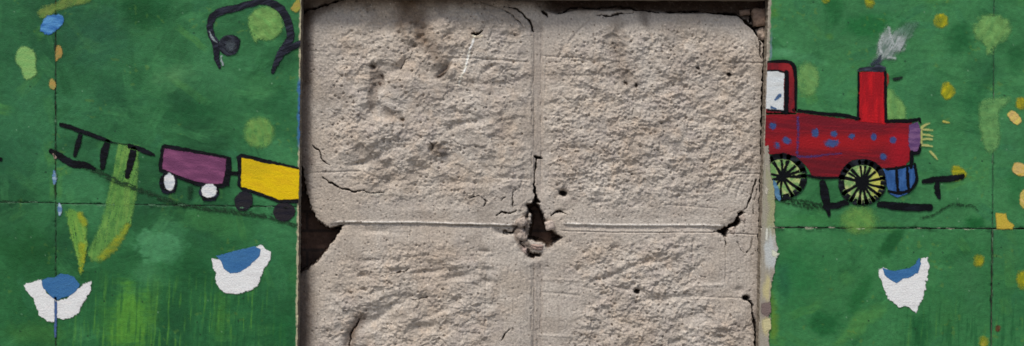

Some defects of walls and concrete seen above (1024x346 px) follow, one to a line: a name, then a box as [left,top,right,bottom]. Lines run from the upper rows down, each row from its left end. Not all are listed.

crack [507,6,764,253]
crack [313,146,383,193]
crack [473,156,566,234]
spalling [513,213,532,255]